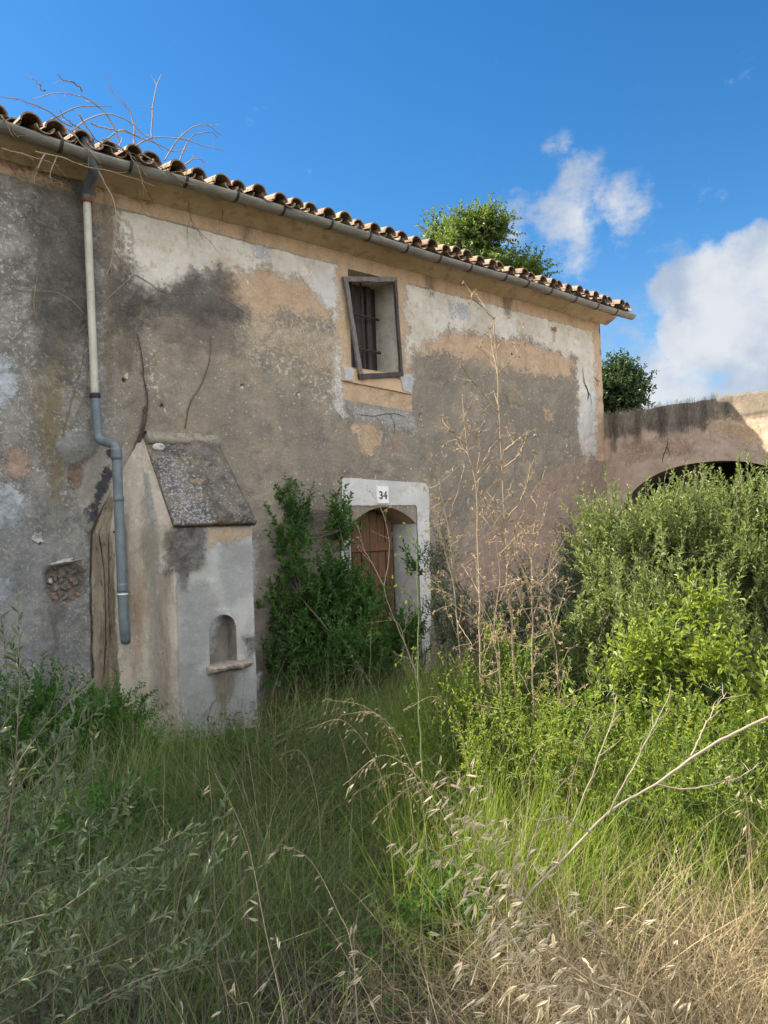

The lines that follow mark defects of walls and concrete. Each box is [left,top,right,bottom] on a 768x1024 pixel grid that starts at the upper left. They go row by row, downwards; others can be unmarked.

water stain [83,449,112,524]
water stain [23,170,243,453]
peeling [107,210,343,395]
peeling [402,284,600,463]
water stain [603,390,768,447]
spalling [43,496,121,708]